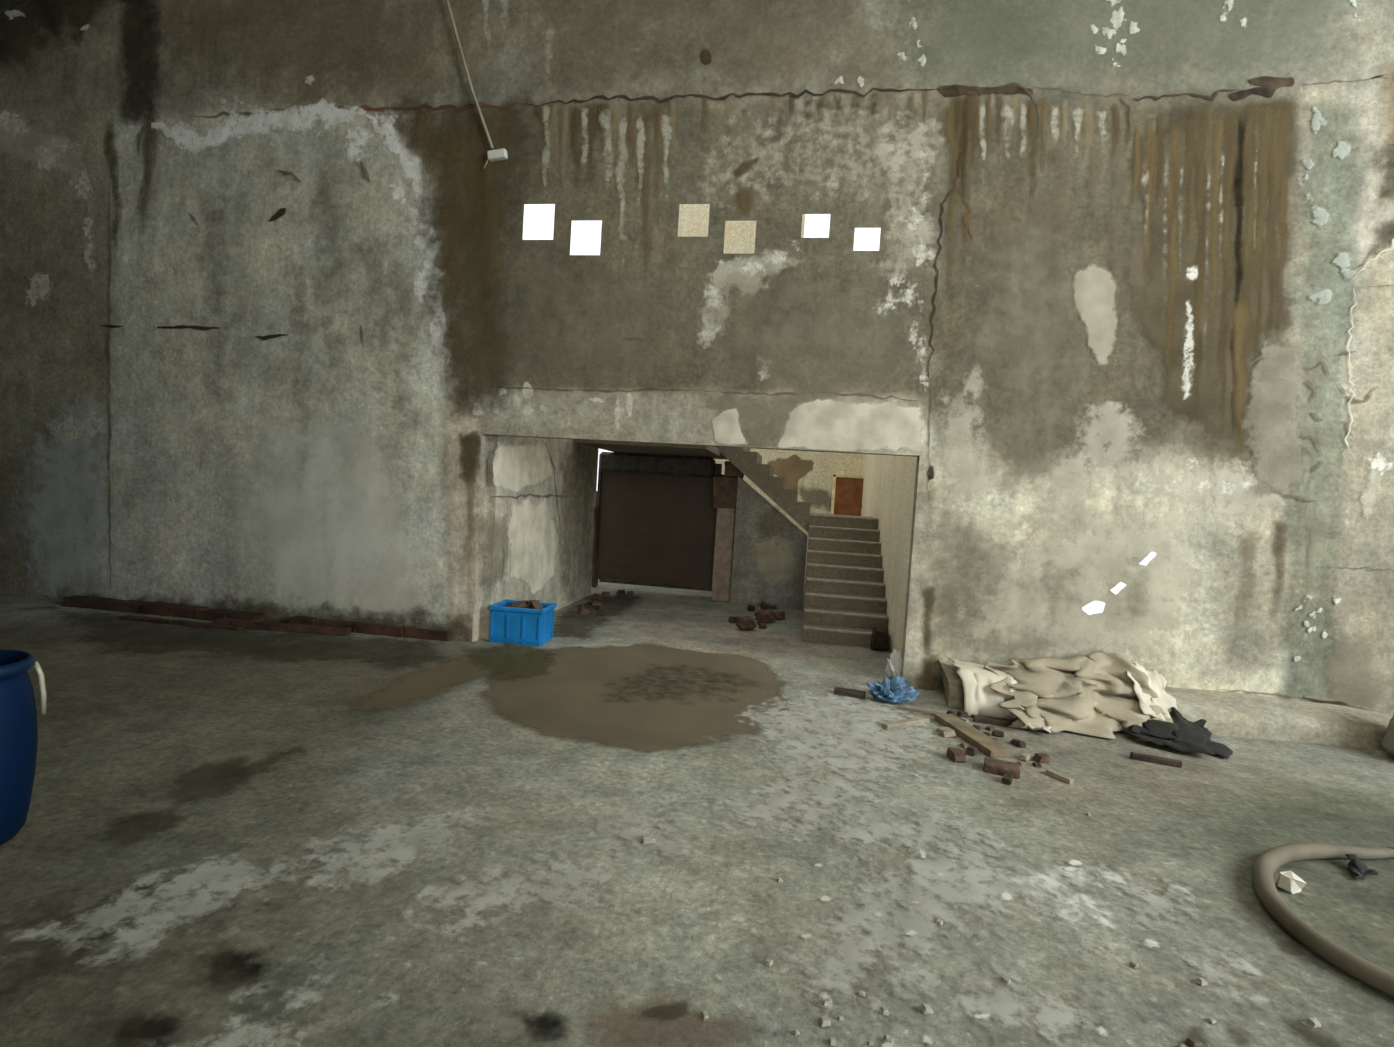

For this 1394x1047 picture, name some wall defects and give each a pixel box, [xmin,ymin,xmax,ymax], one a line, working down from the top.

damp [0,0,102,62]
damp [151,99,452,365]
corrosion [397,99,674,414]
damp [472,255,660,417]
crack [199,85,981,502]
damp [697,97,940,446]
corrosion [773,92,927,141]
corrosion [947,95,1045,217]
crack [1031,86,1133,97]
flaking render [1073,265,1117,365]
corrosion [1113,101,1297,440]
damp [243,423,423,625]